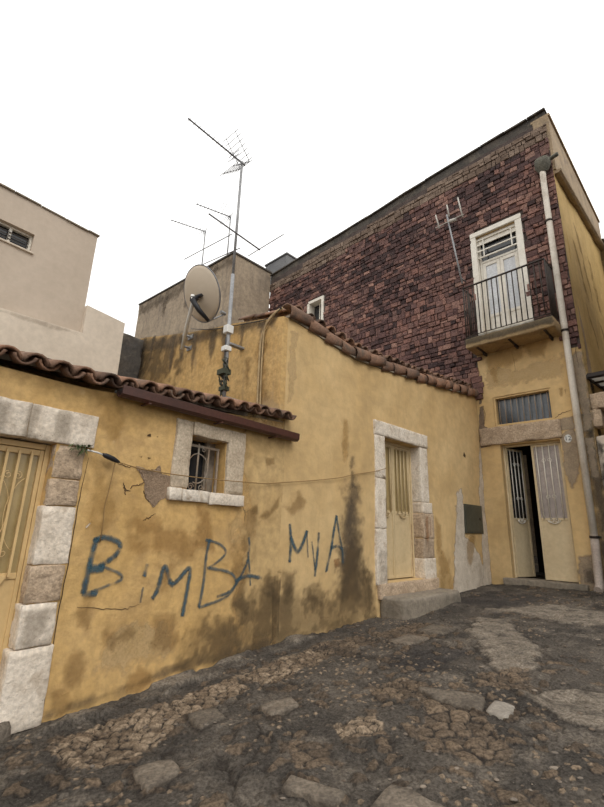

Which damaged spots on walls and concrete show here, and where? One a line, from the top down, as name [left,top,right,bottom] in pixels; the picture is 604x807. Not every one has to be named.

crack [53,458,138,644]
flaking render [130,466,171,507]
damp [158,485,376,676]
peeling [453,445,492,592]
flaking render [479,399,487,429]